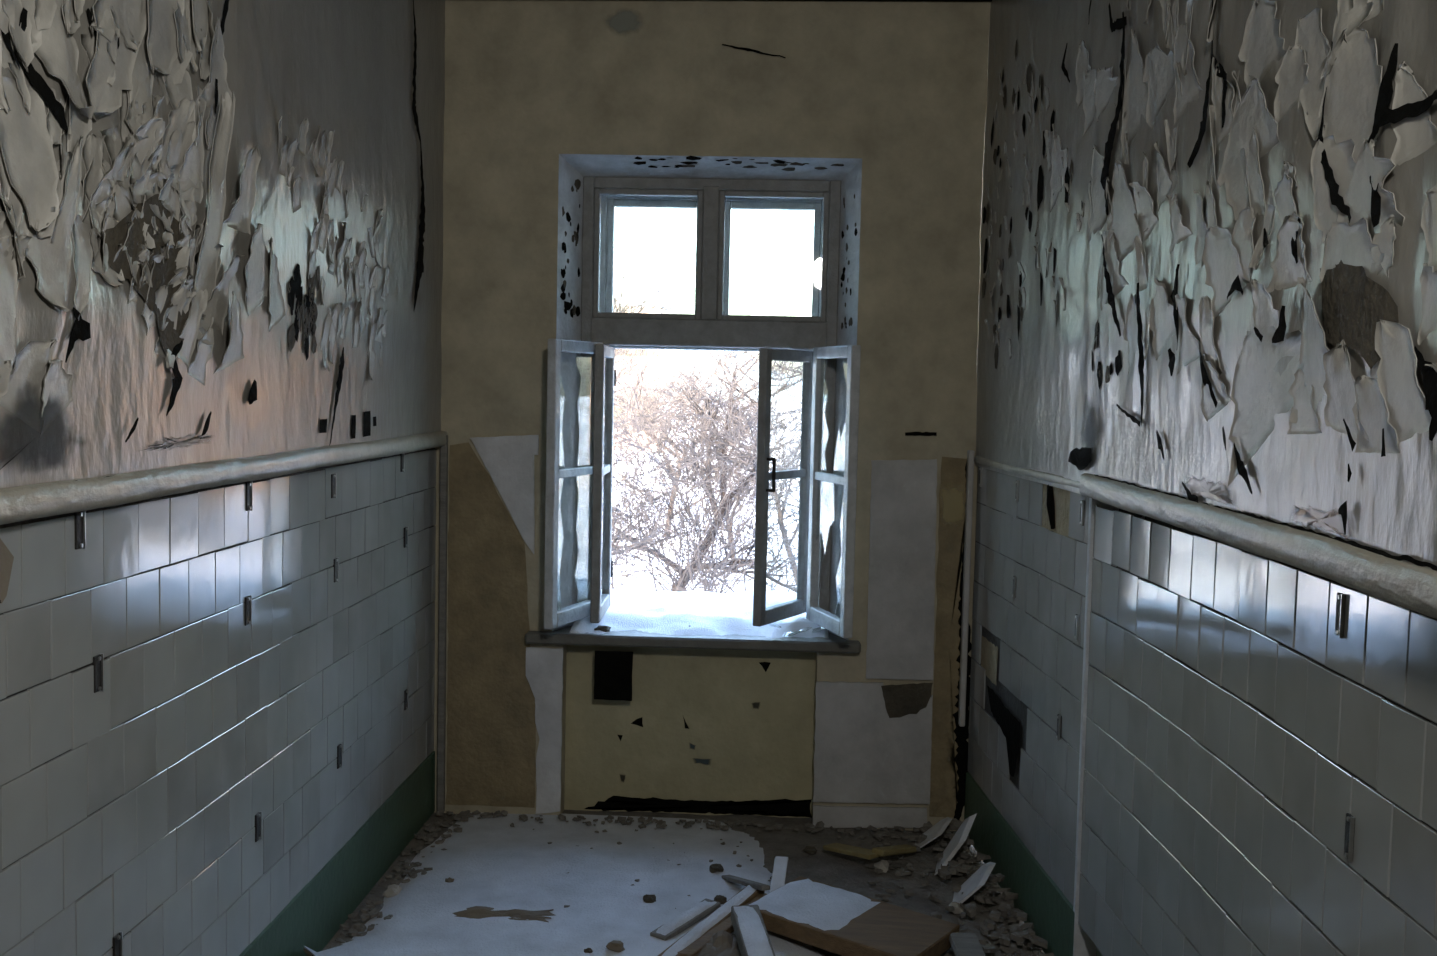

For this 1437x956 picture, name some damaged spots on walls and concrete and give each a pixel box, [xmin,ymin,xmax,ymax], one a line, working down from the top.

peeling [0,0,389,415]
crack [412,0,425,310]
peeling [560,179,581,318]
peeling [633,156,844,171]
peeling [982,0,1437,486]
peeling [987,686,1020,777]